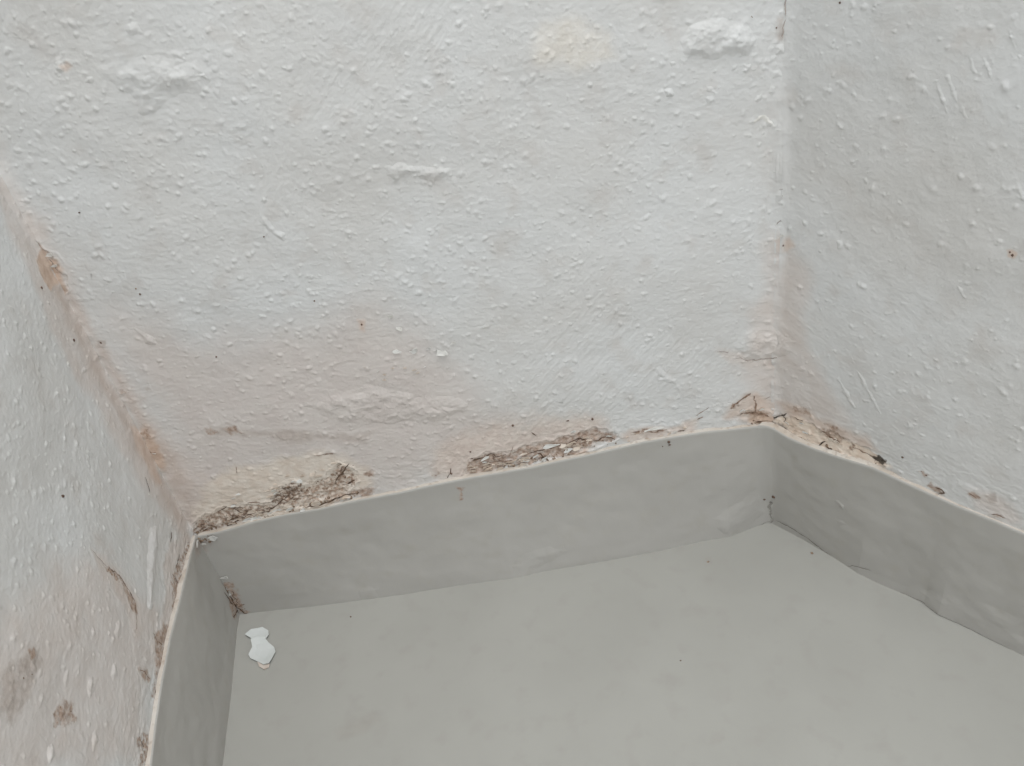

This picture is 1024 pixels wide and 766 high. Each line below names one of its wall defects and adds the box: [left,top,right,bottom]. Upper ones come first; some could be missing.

leakage [0,117,563,766]
peeling [425,401,625,482]
peeling [773,398,897,472]
peeling [190,446,383,535]